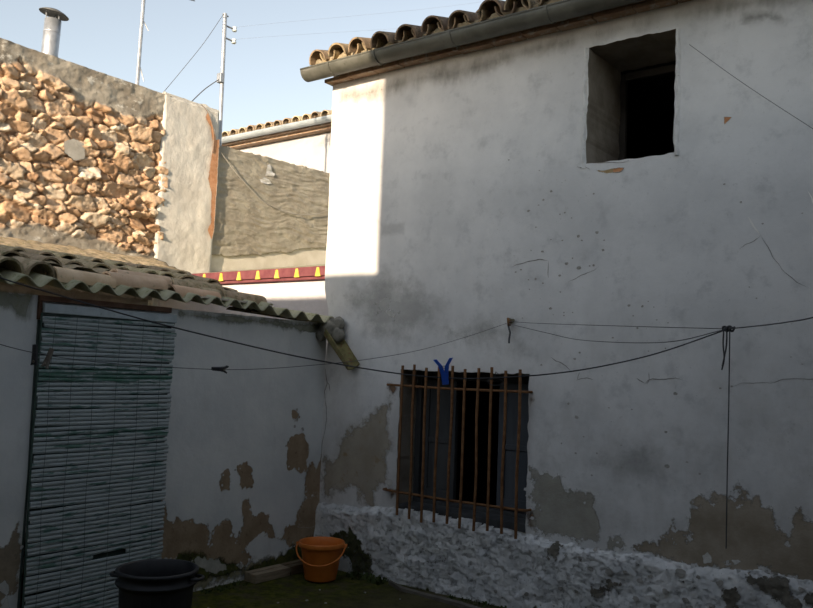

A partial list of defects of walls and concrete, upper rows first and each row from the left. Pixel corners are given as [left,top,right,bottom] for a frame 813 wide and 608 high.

peeling [0,521,24,608]
peeling [159,409,321,574]
flaking render [524,466,813,608]